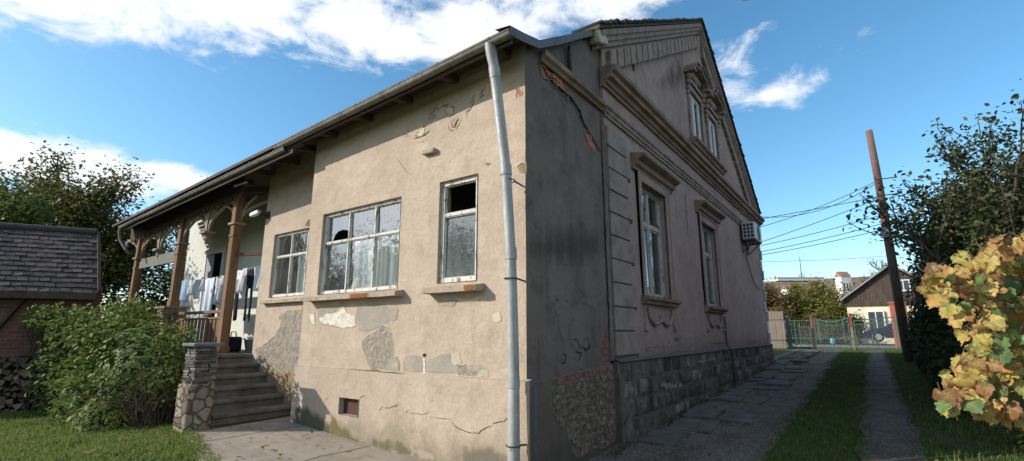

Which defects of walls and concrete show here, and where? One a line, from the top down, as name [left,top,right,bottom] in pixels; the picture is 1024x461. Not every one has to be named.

crack [538,63,610,344]
peeling [255,306,356,404]
peeling [362,307,398,371]
spalling [454,363,489,377]